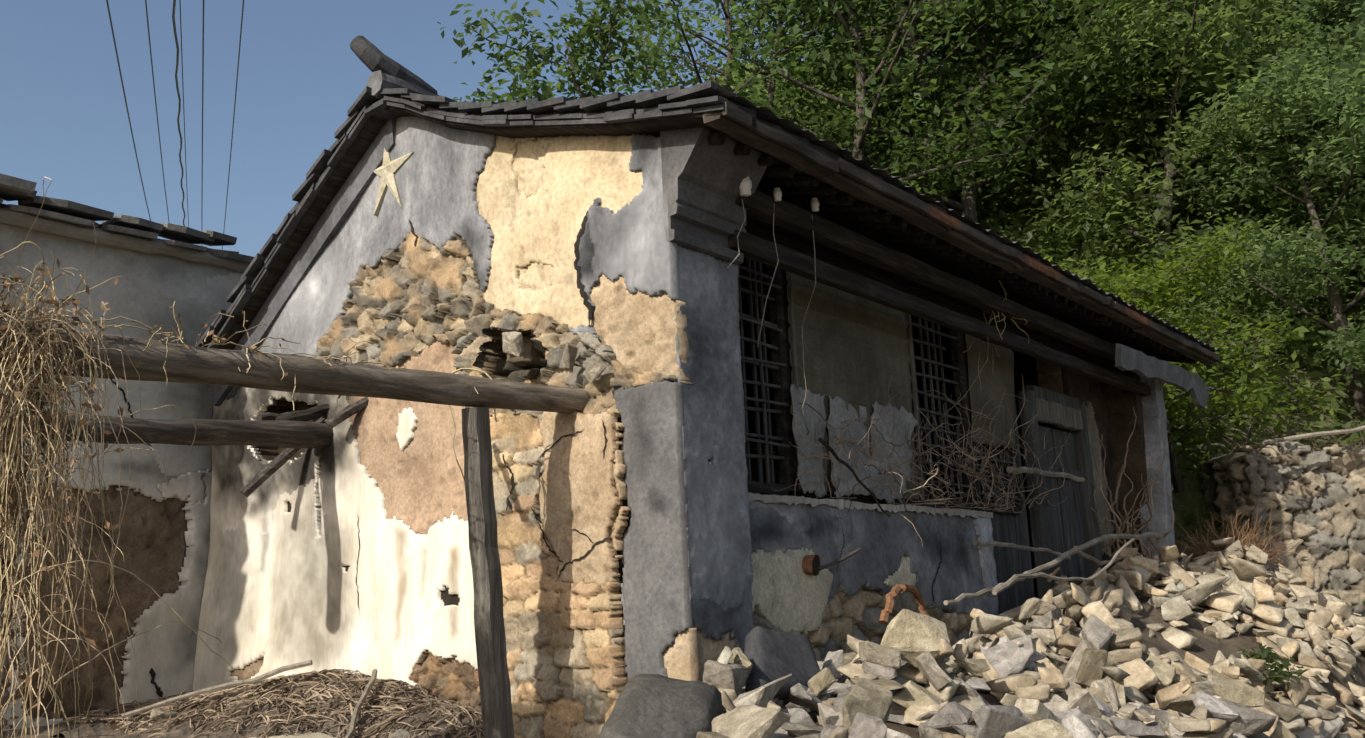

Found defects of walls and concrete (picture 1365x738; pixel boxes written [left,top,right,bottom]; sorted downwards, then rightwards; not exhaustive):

flaking render [386,135,690,382]
flaking render [348,396,468,535]
flaking render [20,485,189,721]
spalling [409,650,482,713]
crack [502,417,631,683]
spalling [663,628,736,682]
flaking render [751,547,833,634]